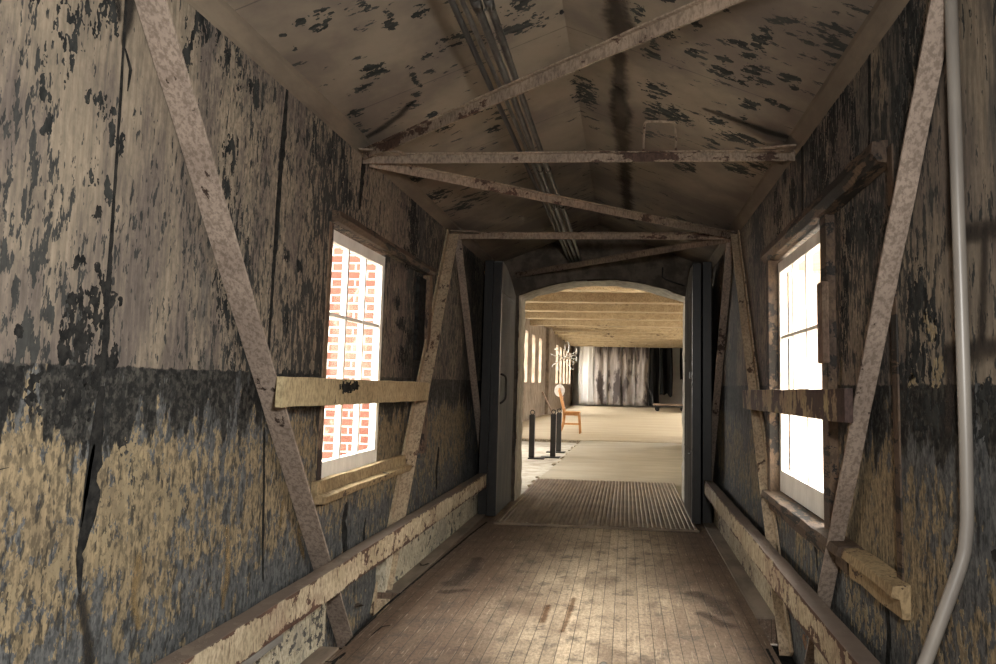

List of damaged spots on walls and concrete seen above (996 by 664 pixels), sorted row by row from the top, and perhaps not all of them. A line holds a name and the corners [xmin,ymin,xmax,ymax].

peeling [39,0,119,136]
peeling [84,88,126,157]
peeling [182,10,263,111]
peeling [279,7,335,37]
peeling [348,62,390,97]
peeling [406,0,559,118]
peeling [637,79,728,127]
peeling [706,27,802,120]
peeling [87,157,113,219]
peeling [217,133,253,276]
peeling [0,253,123,429]
peeling [212,269,244,373]